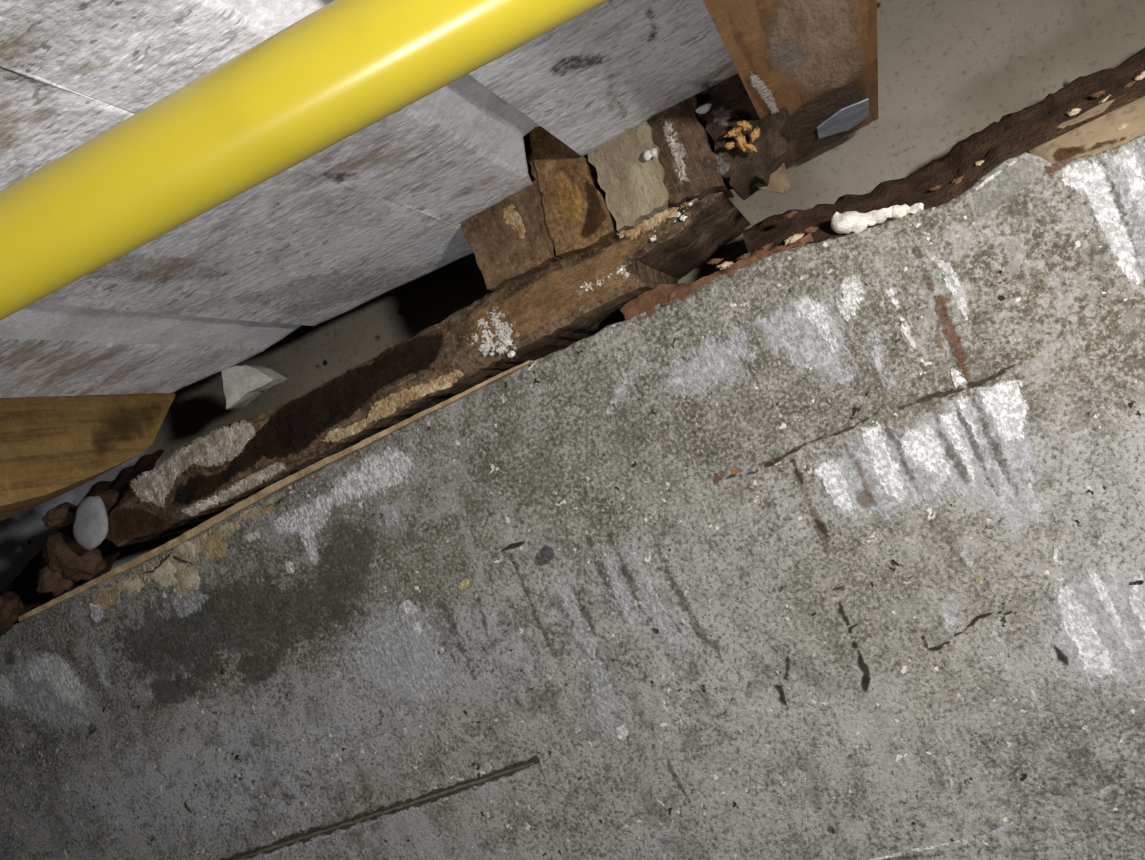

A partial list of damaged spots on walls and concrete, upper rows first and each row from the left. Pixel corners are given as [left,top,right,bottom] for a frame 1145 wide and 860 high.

rust [921,267,971,381]
crack [727,365,1015,479]
damp [116,446,465,704]
damp [509,553,557,655]
damp [554,571,629,741]
damp [587,534,684,652]
damp [655,544,720,651]
crack [833,586,871,691]
crack [922,610,1017,650]